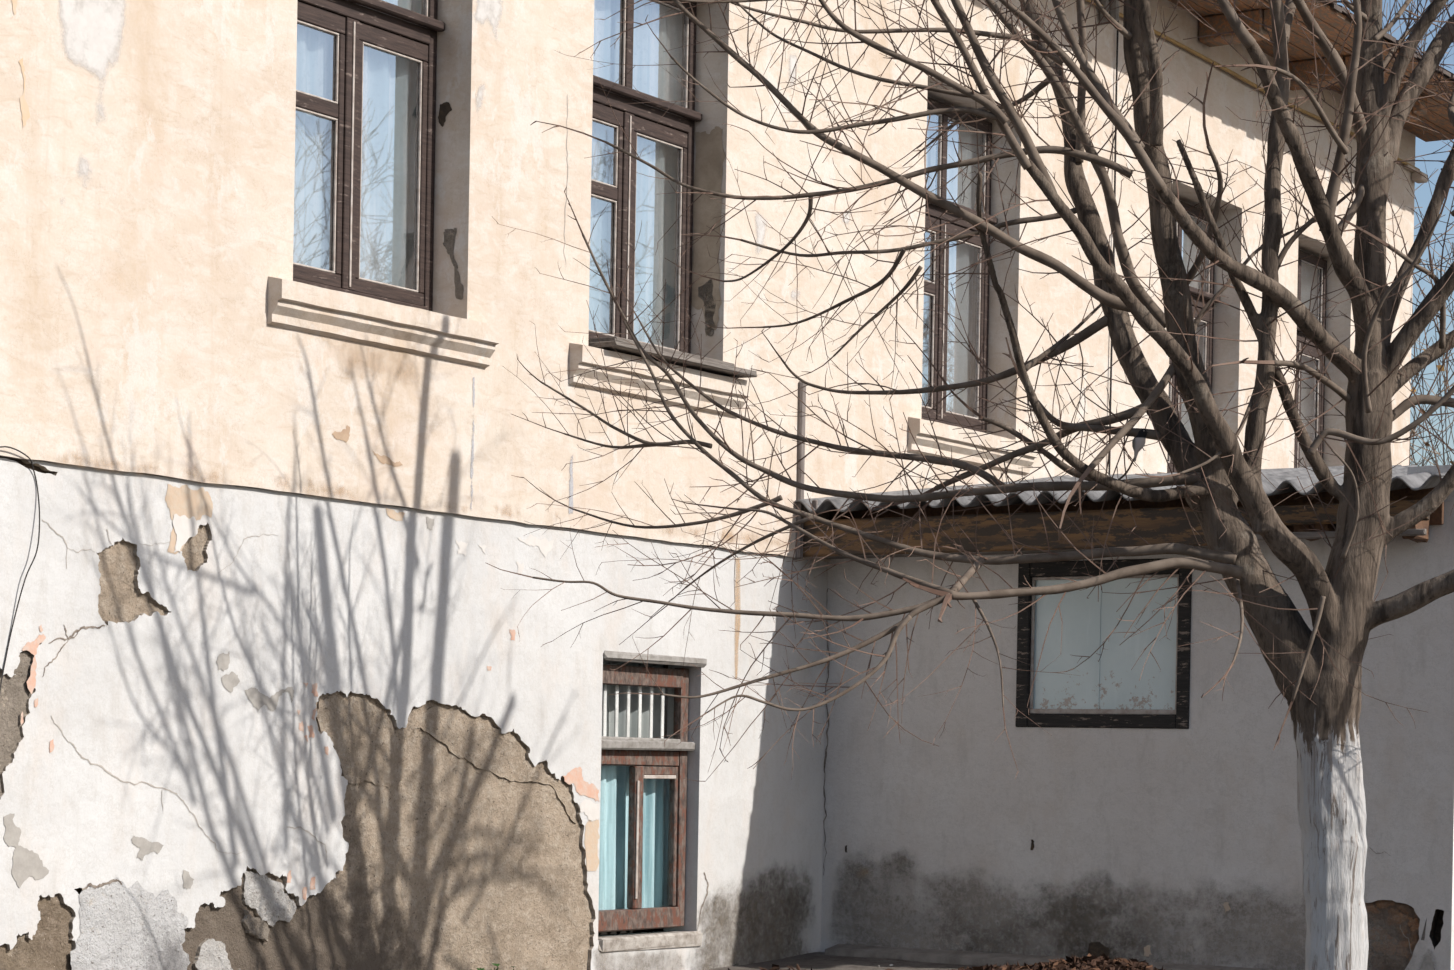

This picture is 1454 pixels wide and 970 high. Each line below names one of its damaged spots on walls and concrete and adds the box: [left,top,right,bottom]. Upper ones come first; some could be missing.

peeling [60,0,124,79]
spalling [443,228,464,300]
peeling [165,484,213,571]
spalling [97,537,171,626]
crack [43,625,105,676]
spalling [0,624,83,970]
crack [51,716,248,855]
spalling [182,652,600,970]
leakage [703,877,809,970]
leakage [836,855,1306,970]
leakage [1367,920,1397,970]
spalling [1365,900,1444,970]